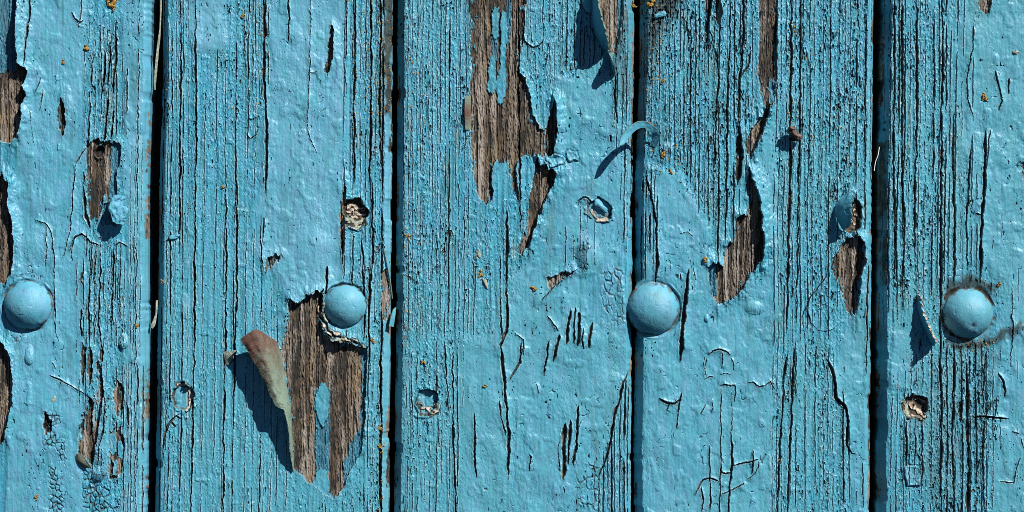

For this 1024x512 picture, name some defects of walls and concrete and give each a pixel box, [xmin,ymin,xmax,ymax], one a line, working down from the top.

peeling [0,175,14,285]
peeling [0,0,27,143]
peeling [86,139,128,227]
peeling [465,0,578,254]
peeling [708,168,763,305]
crack [646,0,834,512]
peeling [757,0,778,112]
peeling [831,192,865,315]
peeling [0,343,13,444]
peeling [223,291,368,498]
crack [600,377,626,471]
crack [828,361,851,452]